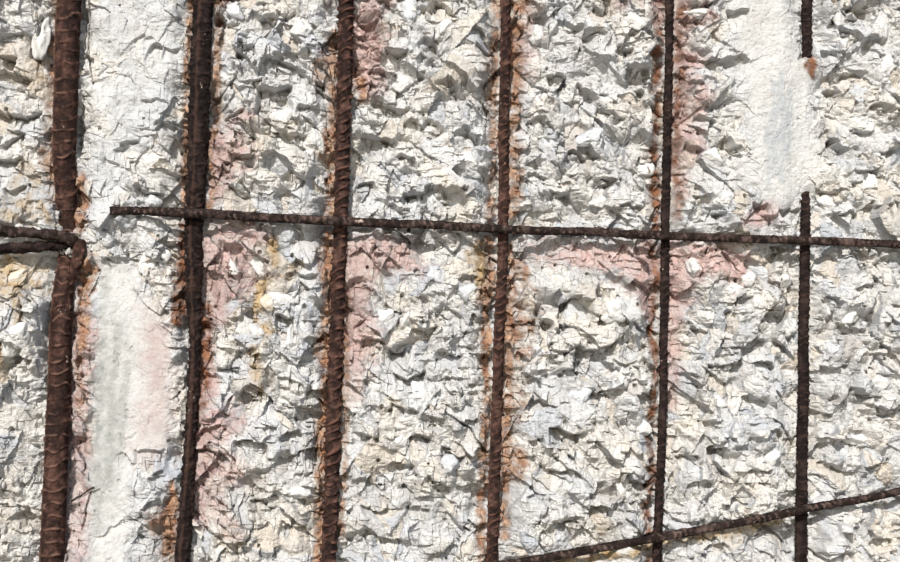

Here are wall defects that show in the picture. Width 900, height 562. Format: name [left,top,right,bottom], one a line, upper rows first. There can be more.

spalling [51,0,83,235]
spalling [134,185,165,207]
corrosion [315,30,338,217]
spalling [183,0,755,232]
corrosion [651,0,665,133]
corrosion [671,7,719,199]
spalling [799,0,900,237]
spalling [0,250,75,562]
corrosion [312,232,333,562]
corrosion [466,236,535,561]
spalling [174,218,900,562]
corrosion [551,240,746,562]